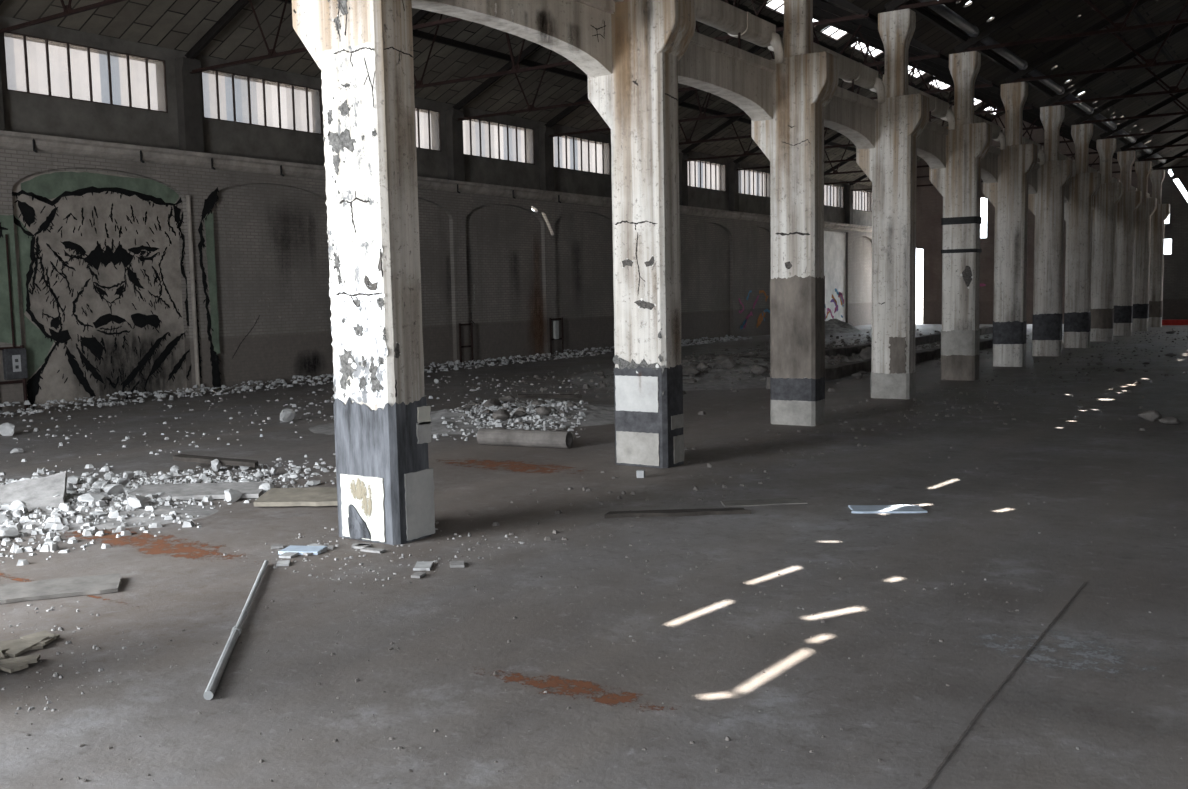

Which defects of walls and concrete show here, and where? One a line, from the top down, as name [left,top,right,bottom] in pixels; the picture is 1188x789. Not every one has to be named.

peeling [323,80,377,194]
peeling [328,244,345,285]
peeling [333,246,401,398]
corrosion [474,670,681,711]